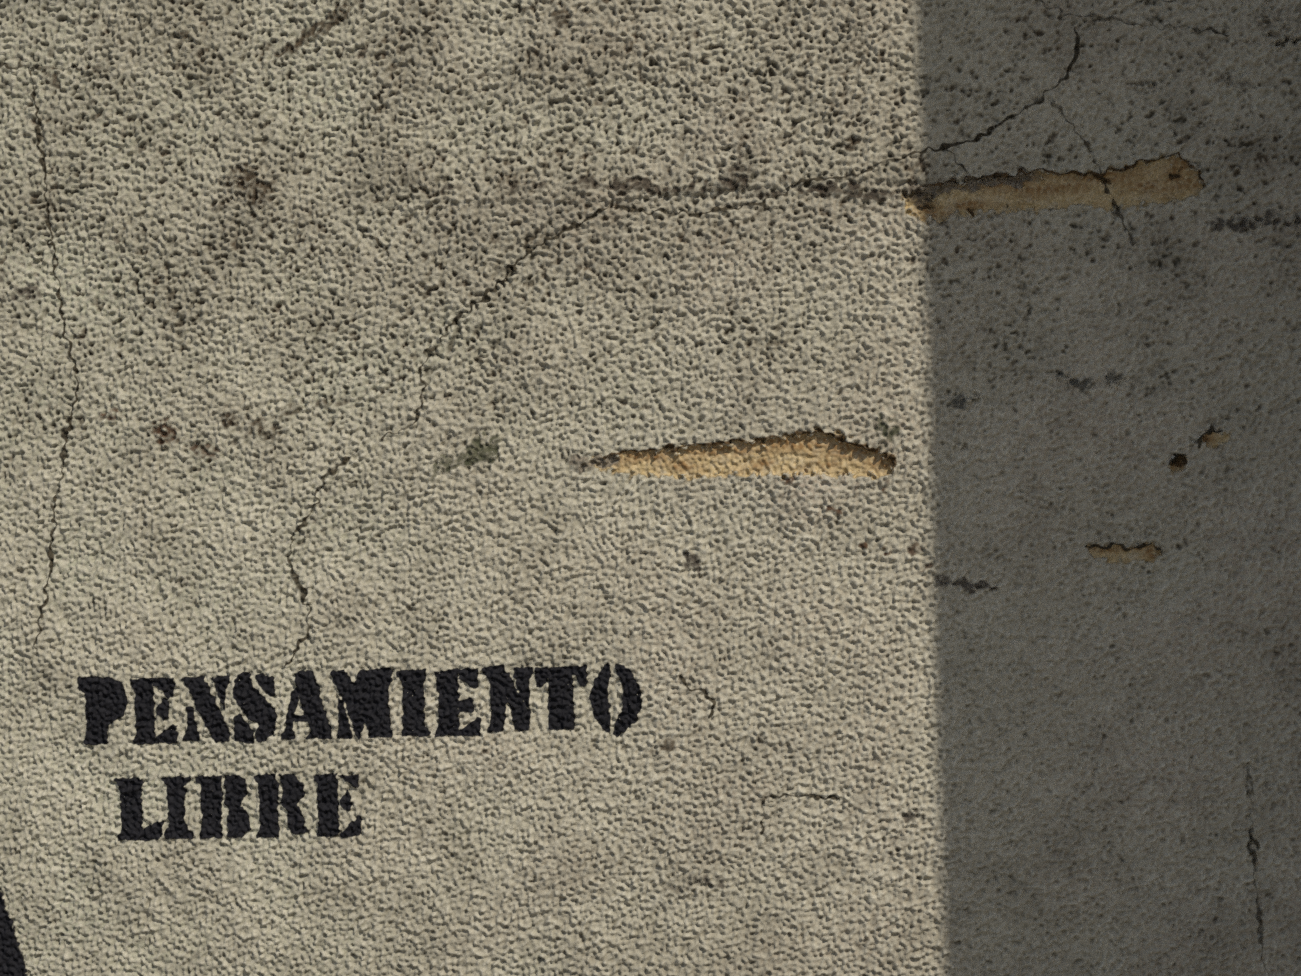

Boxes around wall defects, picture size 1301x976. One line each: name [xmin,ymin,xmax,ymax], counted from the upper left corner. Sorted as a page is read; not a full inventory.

spalling [901,152,1205,223]
crack [0,61,82,645]
crack [284,0,1140,667]
spalling [567,427,897,481]
spalling [1084,542,1161,564]